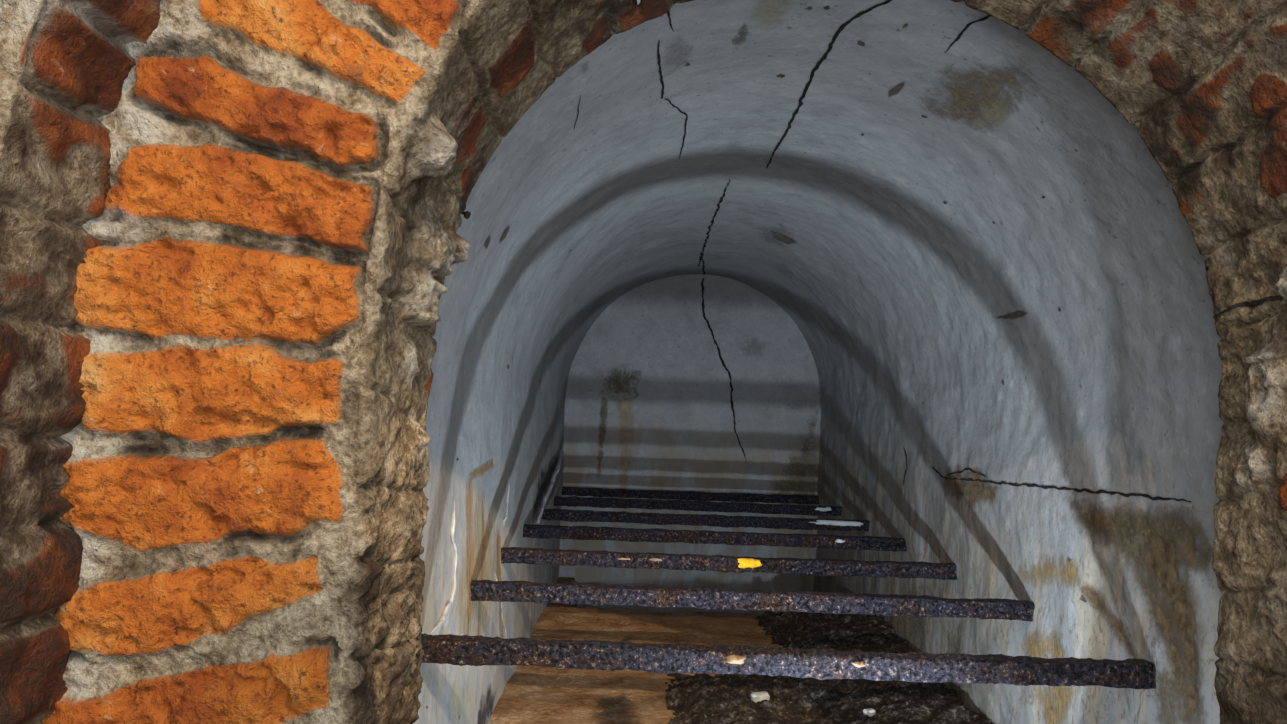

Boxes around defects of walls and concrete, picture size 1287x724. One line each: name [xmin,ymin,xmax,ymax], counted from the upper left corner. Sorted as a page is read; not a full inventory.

crack [634,0,688,159]
crack [766,0,892,168]
water stain [927,69,1026,124]
crack [698,179,747,461]
corrosion [460,461,503,638]